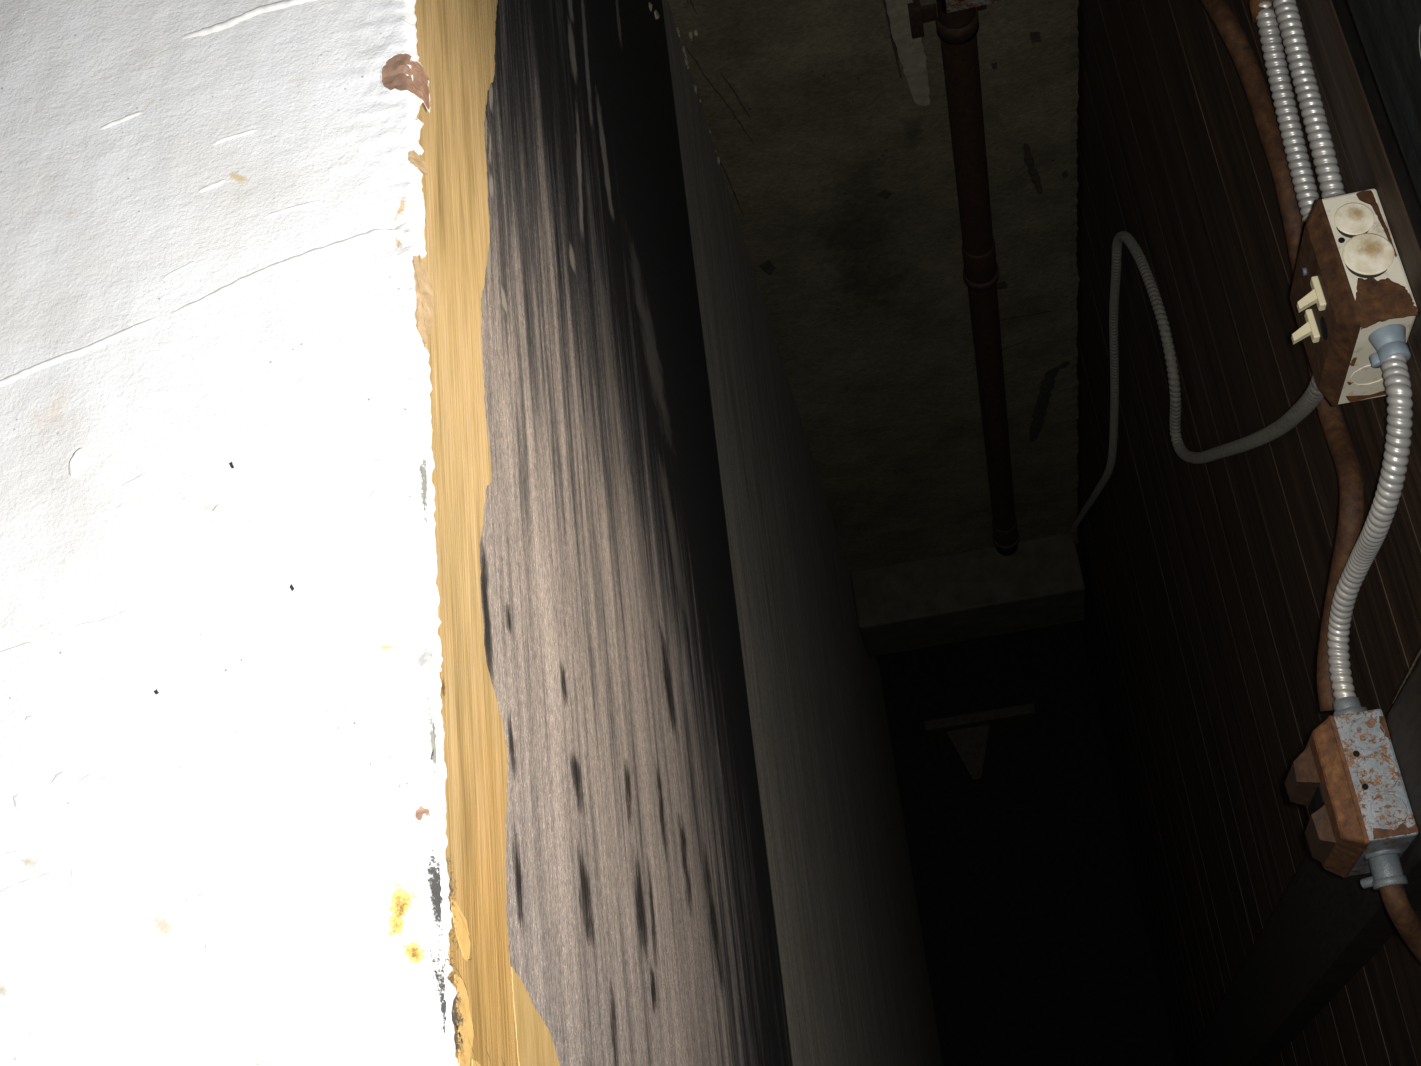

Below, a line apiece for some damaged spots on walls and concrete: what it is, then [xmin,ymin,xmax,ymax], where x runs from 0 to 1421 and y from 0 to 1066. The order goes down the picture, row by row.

peeling [380,52,430,113]
peeling [408,150,428,174]
peeling [394,223,434,344]
peeling [413,804,434,824]
peeling [450,896,560,1066]